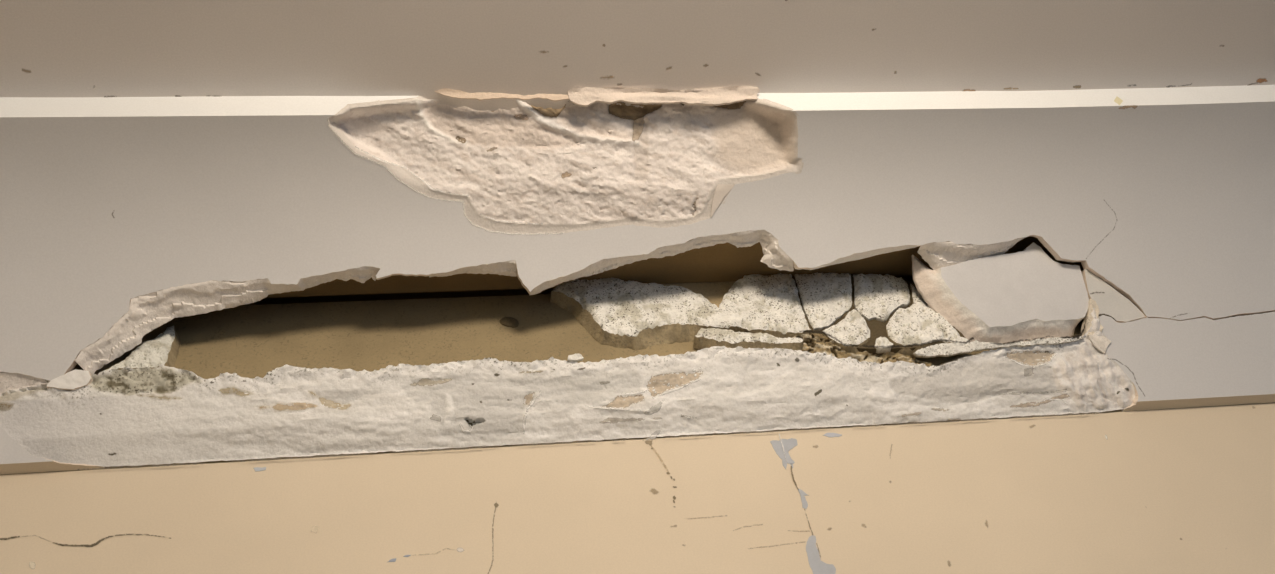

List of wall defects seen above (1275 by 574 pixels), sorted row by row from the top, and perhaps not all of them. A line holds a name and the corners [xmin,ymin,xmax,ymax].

spalling [0,86,1135,574]
crack [799,292,1116,348]
crack [53,534,164,547]